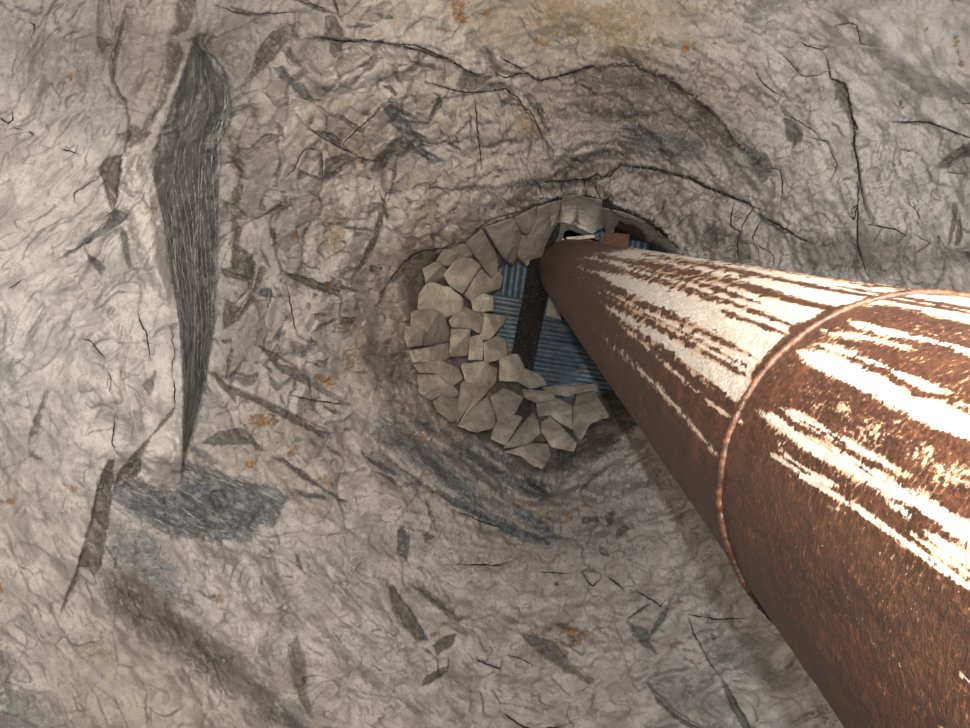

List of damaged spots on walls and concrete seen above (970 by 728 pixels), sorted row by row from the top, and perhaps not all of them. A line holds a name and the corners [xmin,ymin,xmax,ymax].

crack [214,0,338,15]
crack [282,102,387,181]
crack [311,35,641,170]
crack [756,22,930,283]
crack [900,121,970,138]